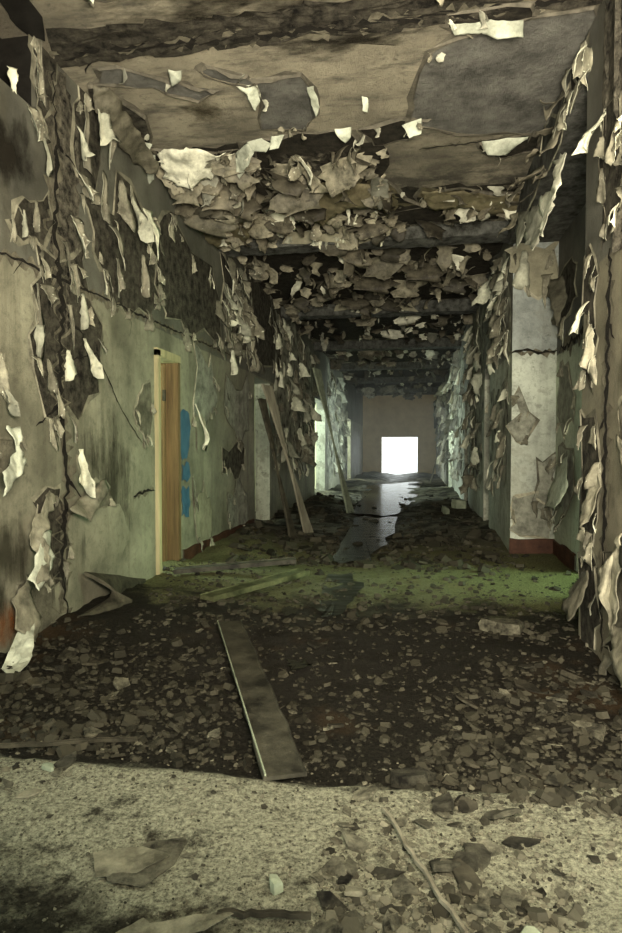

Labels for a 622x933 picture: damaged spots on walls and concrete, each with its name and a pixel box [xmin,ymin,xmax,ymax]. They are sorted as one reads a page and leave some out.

crack [0,0,570,614]
peeling [0,0,622,688]
crack [511,204,622,652]